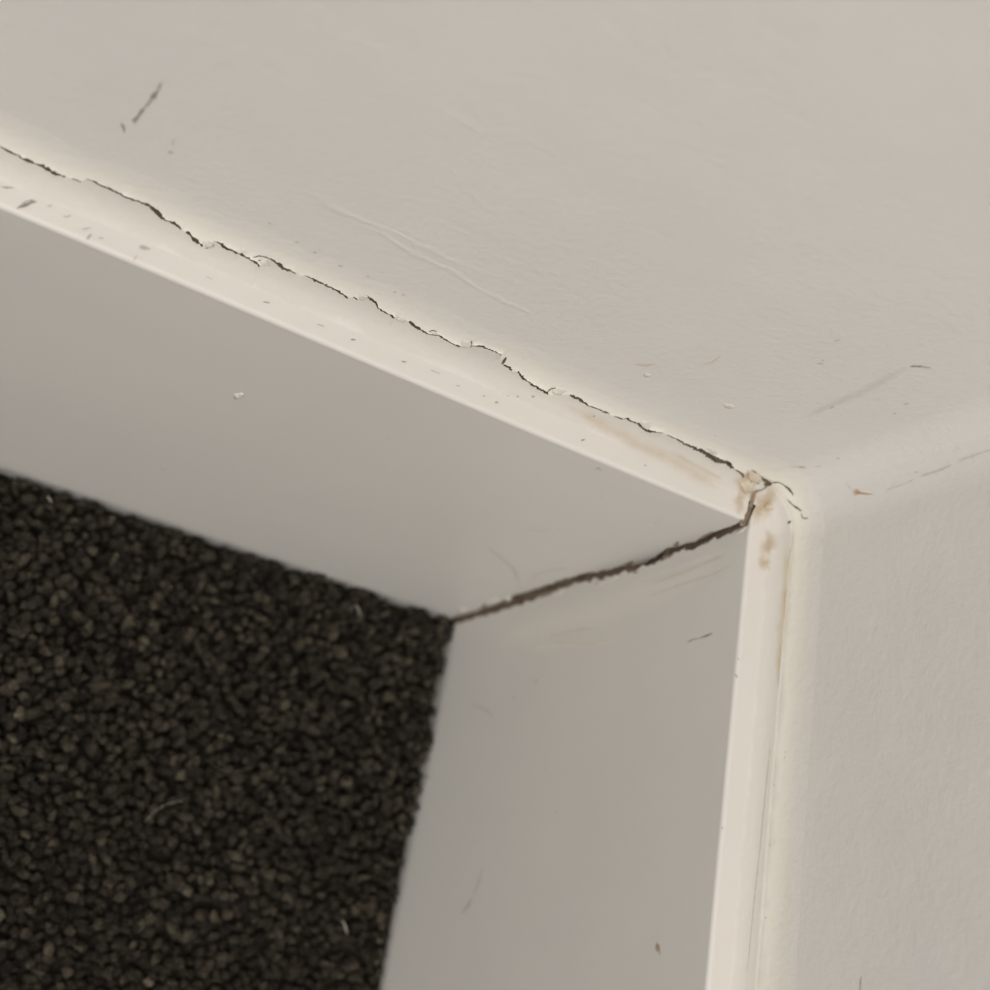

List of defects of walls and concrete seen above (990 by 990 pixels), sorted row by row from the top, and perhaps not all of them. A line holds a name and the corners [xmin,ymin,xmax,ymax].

crack [1,147,807,624]